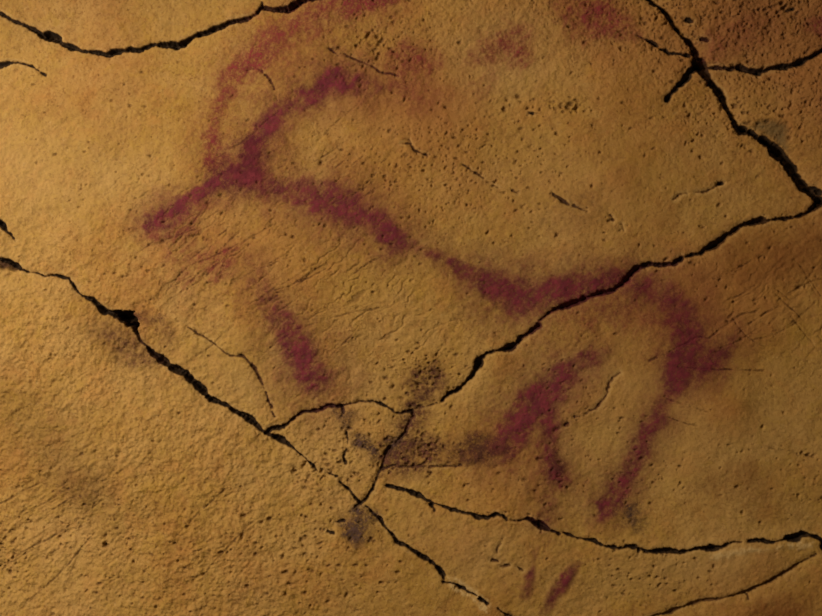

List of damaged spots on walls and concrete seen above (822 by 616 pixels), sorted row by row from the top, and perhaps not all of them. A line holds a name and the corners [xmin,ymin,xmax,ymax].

crack [0,0,315,58]
crack [0,61,47,77]
crack [328,48,397,76]
crack [0,219,15,240]
crack [422,0,822,407]
crack [0,257,489,605]
crack [558,377,613,429]
crack [385,484,822,616]